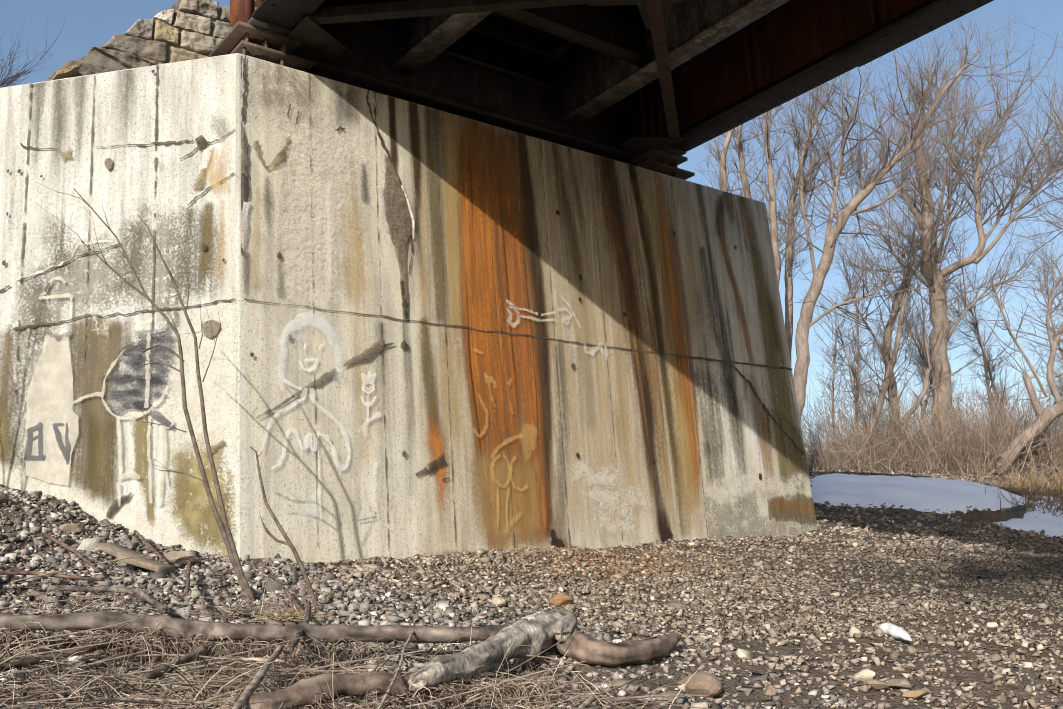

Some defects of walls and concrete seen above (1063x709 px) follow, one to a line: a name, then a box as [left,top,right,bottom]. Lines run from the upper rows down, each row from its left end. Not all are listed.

water stain [0,317,203,554]
water stain [226,58,236,196]
crack [366,90,413,274]
rust [418,108,702,550]
water stain [574,157,684,535]
water stain [696,183,817,524]